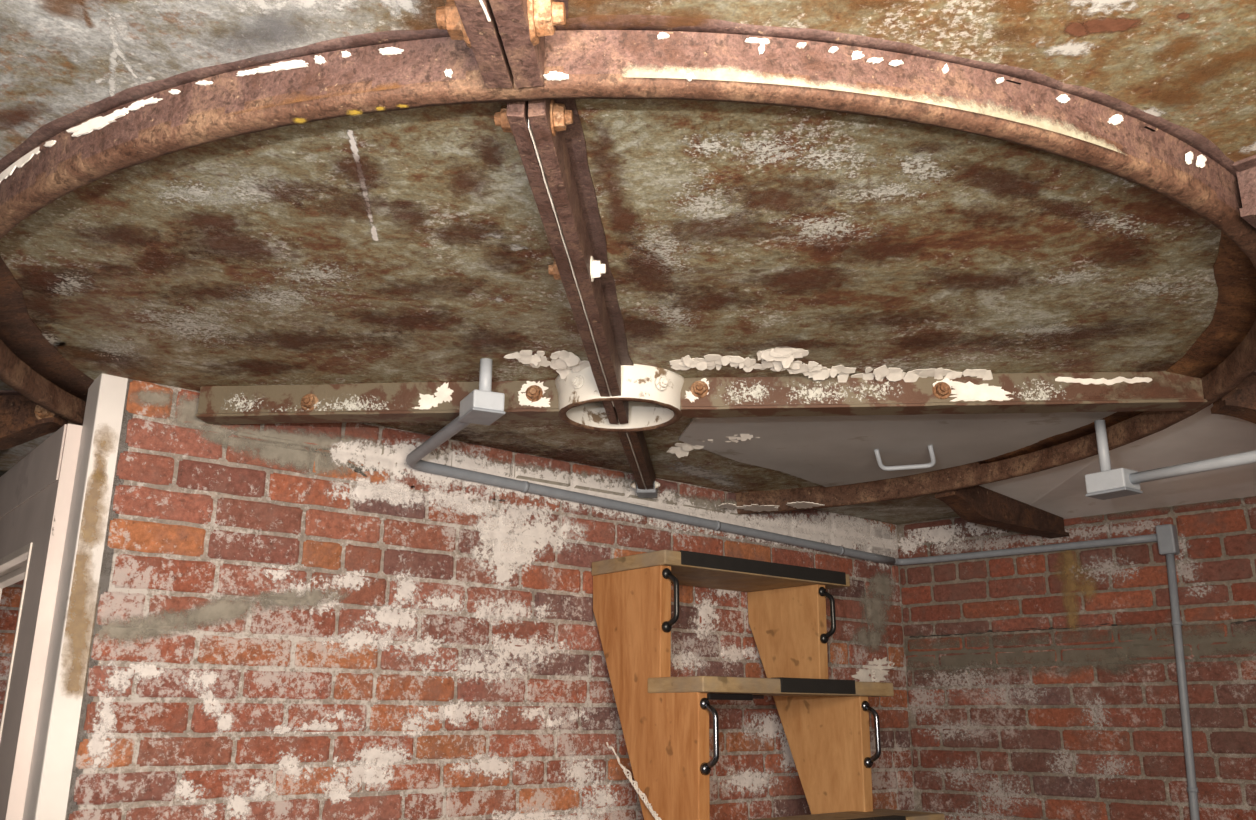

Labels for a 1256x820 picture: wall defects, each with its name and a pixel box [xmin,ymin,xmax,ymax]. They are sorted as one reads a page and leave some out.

peeling [66,89,181,137]
peeling [624,67,1118,152]
corrosion [589,129,752,310]
corrosion [737,339,847,351]
peeling [504,350,590,408]
peeling [670,347,1152,405]
corrosion [1094,357,1188,400]
corrosion [423,430,624,469]
damp [322,439,1159,683]
damp [265,565,376,616]
damp [86,660,165,773]
damp [175,699,588,820]